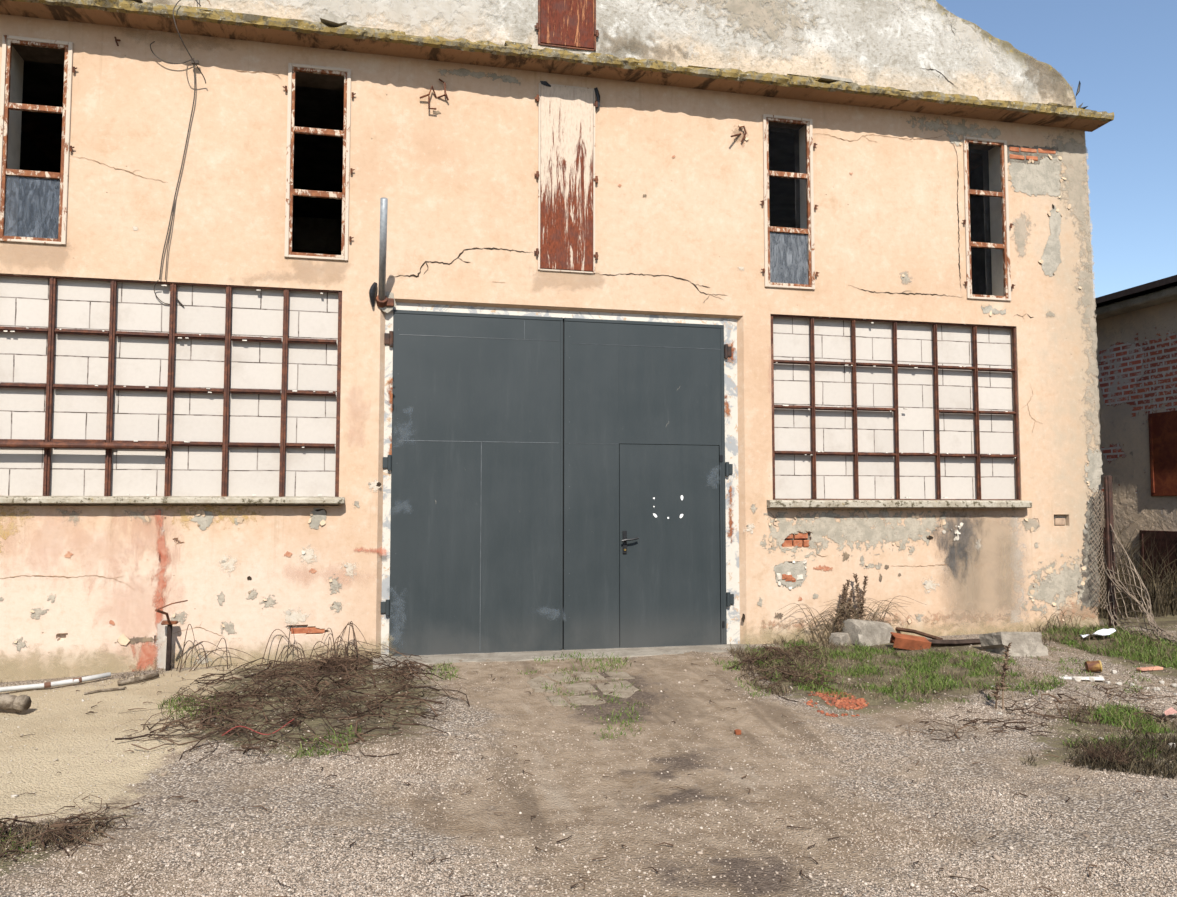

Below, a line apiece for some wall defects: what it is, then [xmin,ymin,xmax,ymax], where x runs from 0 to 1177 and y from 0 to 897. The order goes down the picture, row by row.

crack [389,247,524,278]
crack [595,273,721,303]
peeling [906,115,1126,624]
corrosion [154,510,169,629]
peeling [746,504,964,601]
water stain [949,518,1014,614]
peeling [762,613,812,631]
peeling [873,613,1010,625]
corrosion [132,642,161,672]